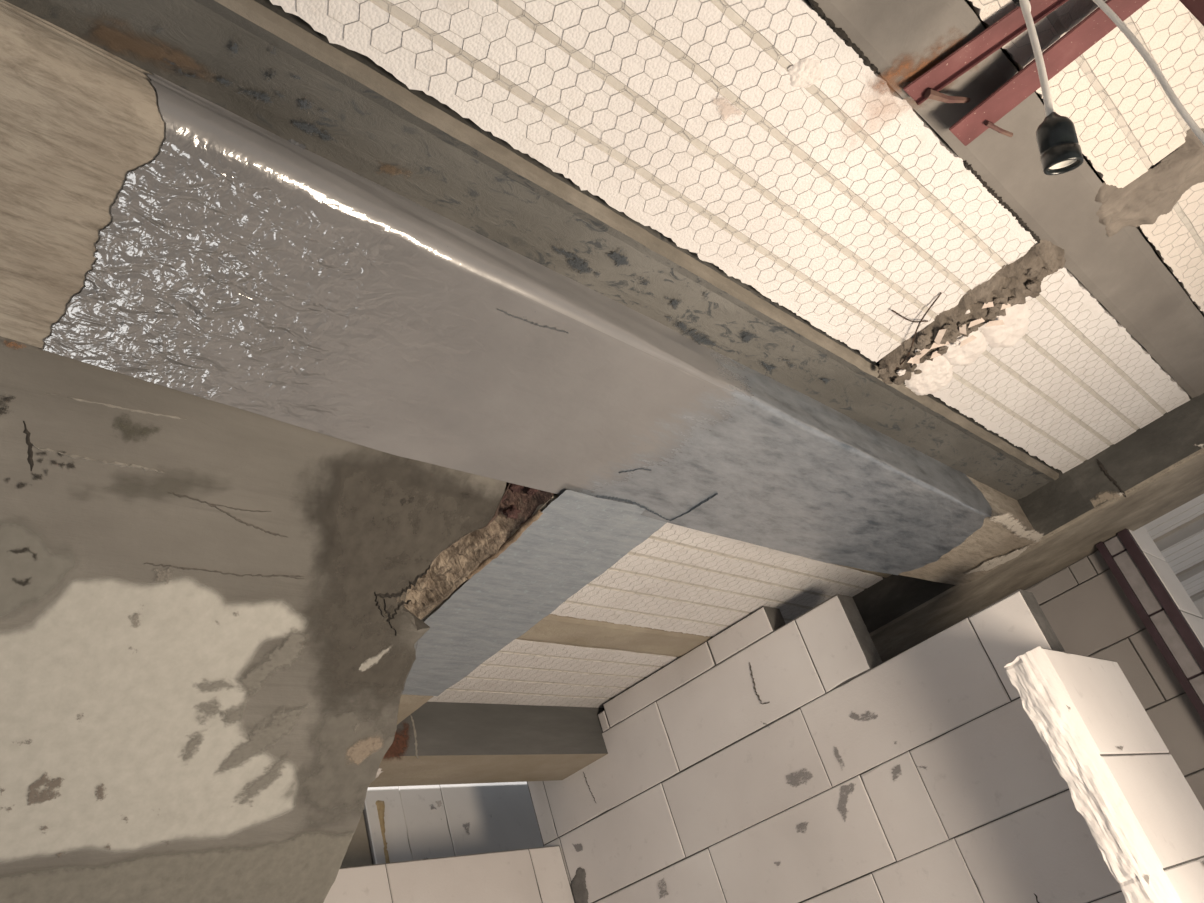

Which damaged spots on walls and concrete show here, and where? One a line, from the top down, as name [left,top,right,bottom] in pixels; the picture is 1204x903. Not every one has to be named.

crack [808,0,881,74]
corrosion [875,47,956,93]
crack [963,160,1040,243]
crack [23,421,34,471]
crack [144,563,306,580]
crack [167,492,287,537]
spalling [404,482,554,620]
water stain [0,460,501,903]